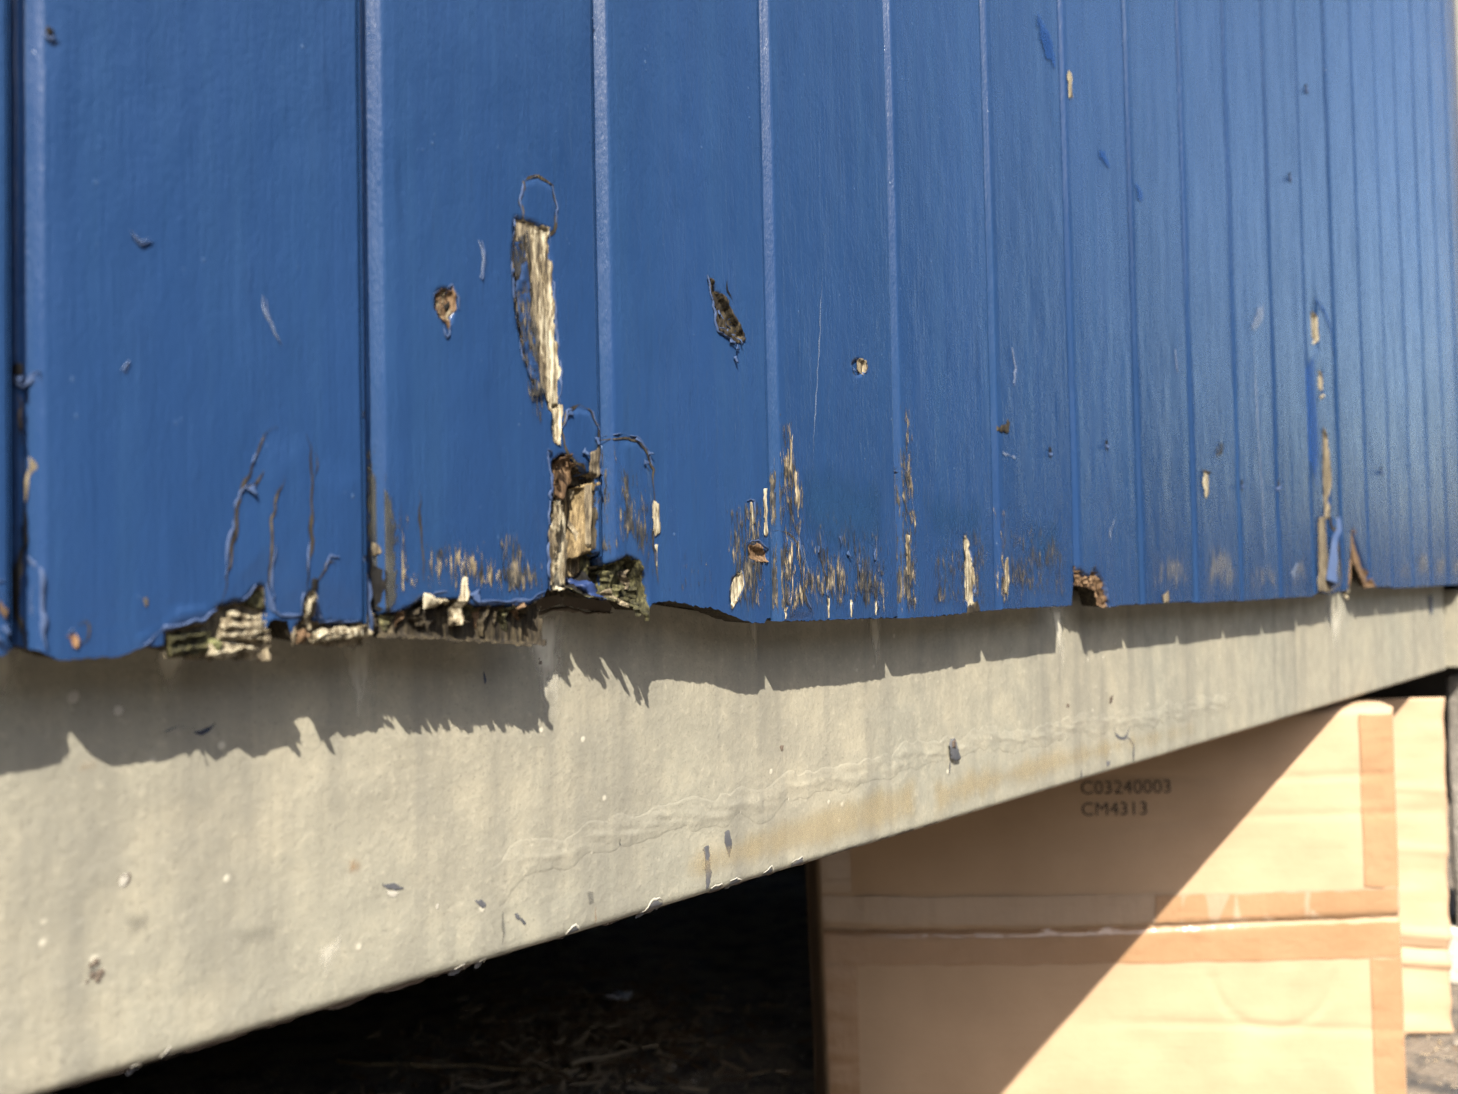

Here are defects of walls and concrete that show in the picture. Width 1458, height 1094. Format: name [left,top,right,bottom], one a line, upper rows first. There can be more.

spalling [707,275,746,363]
peeling [511,174,604,592]
peeling [1305,296,1375,600]
peeling [0,580,10,643]
peeling [363,555,374,631]
peeling [727,405,917,619]
peeling [935,508,1111,614]